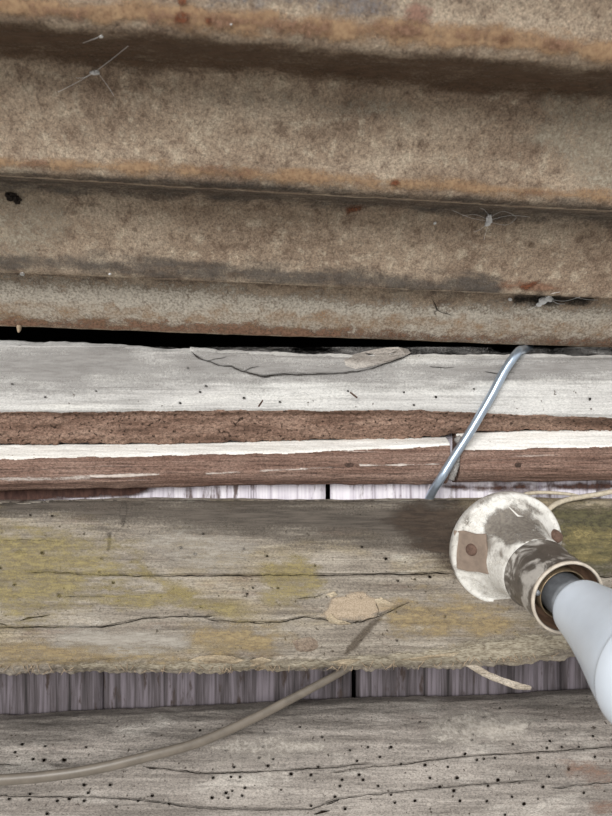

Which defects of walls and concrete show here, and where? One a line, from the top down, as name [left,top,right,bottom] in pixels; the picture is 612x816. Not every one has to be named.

rust [0,0,612,63]
damp [0,23,612,188]
rust [0,158,612,202]
crack [191,351,408,377]
damp [0,487,473,571]
crack [29,571,450,628]
crack [2,615,58,628]
damp [55,627,189,655]
crack [146,747,605,774]
crack [0,795,268,811]
crack [289,780,535,815]